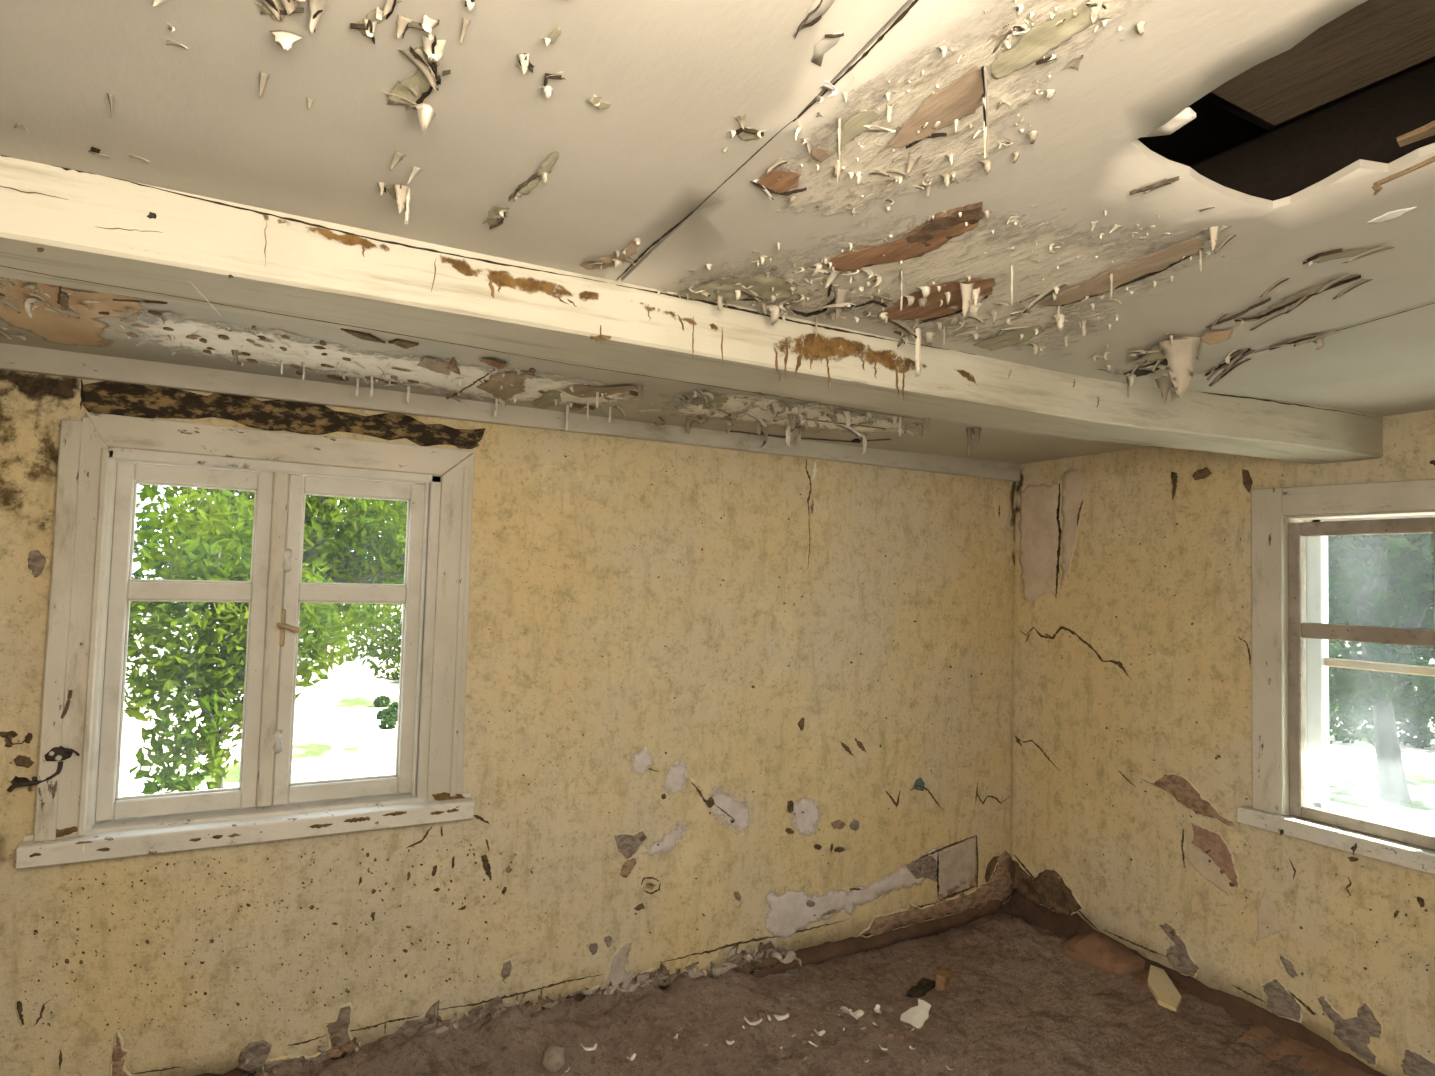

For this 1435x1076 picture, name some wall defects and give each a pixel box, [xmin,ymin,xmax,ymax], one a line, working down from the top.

peeling [253,0,328,51]
peeling [350,0,476,134]
peeling [515,53,566,100]
peeling [377,151,423,224]
peeling [657,0,1395,405]
peeling [0,277,931,456]
damp [0,370,78,510]
crack [1021,626,1132,680]
flaking render [407,792,512,894]
peeling [1141,773,1240,895]
peeling [393,825,1082,1037]
flaking render [1261,955,1384,1068]